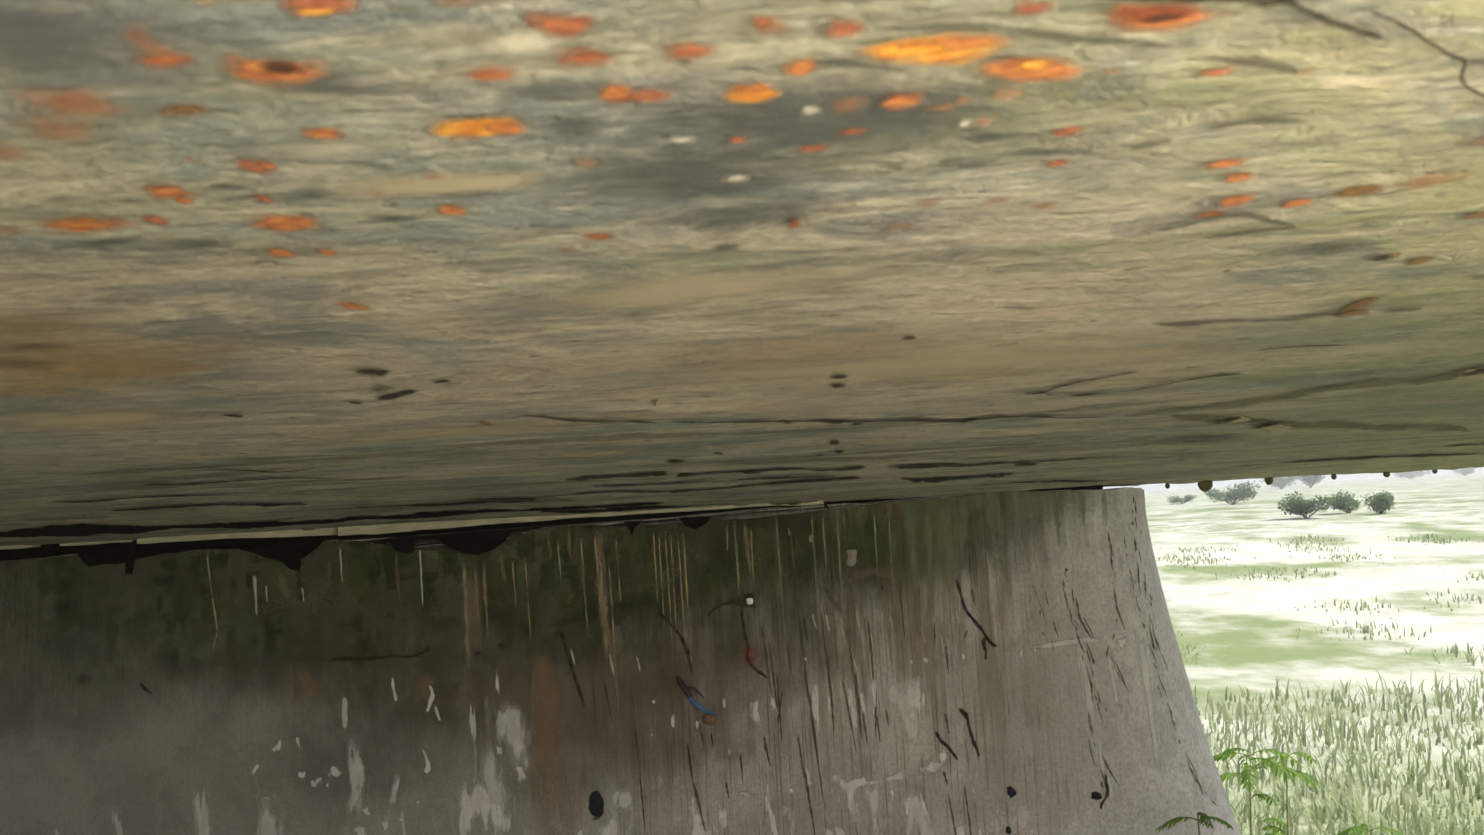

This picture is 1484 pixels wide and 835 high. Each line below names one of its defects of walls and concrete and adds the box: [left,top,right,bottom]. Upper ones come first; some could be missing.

rust [436,118,521,137]
rust [727,84,779,103]
rust [866,35,1078,82]
crack [893,24,1165,47]
crack [1133,0,1484,97]
leakage [811,499,976,753]
crack [956,580,997,660]
leakage [354,526,823,835]
peeling [812,611,944,741]
peeling [298,697,420,835]
peeling [459,675,528,835]
leakage [943,772,972,835]